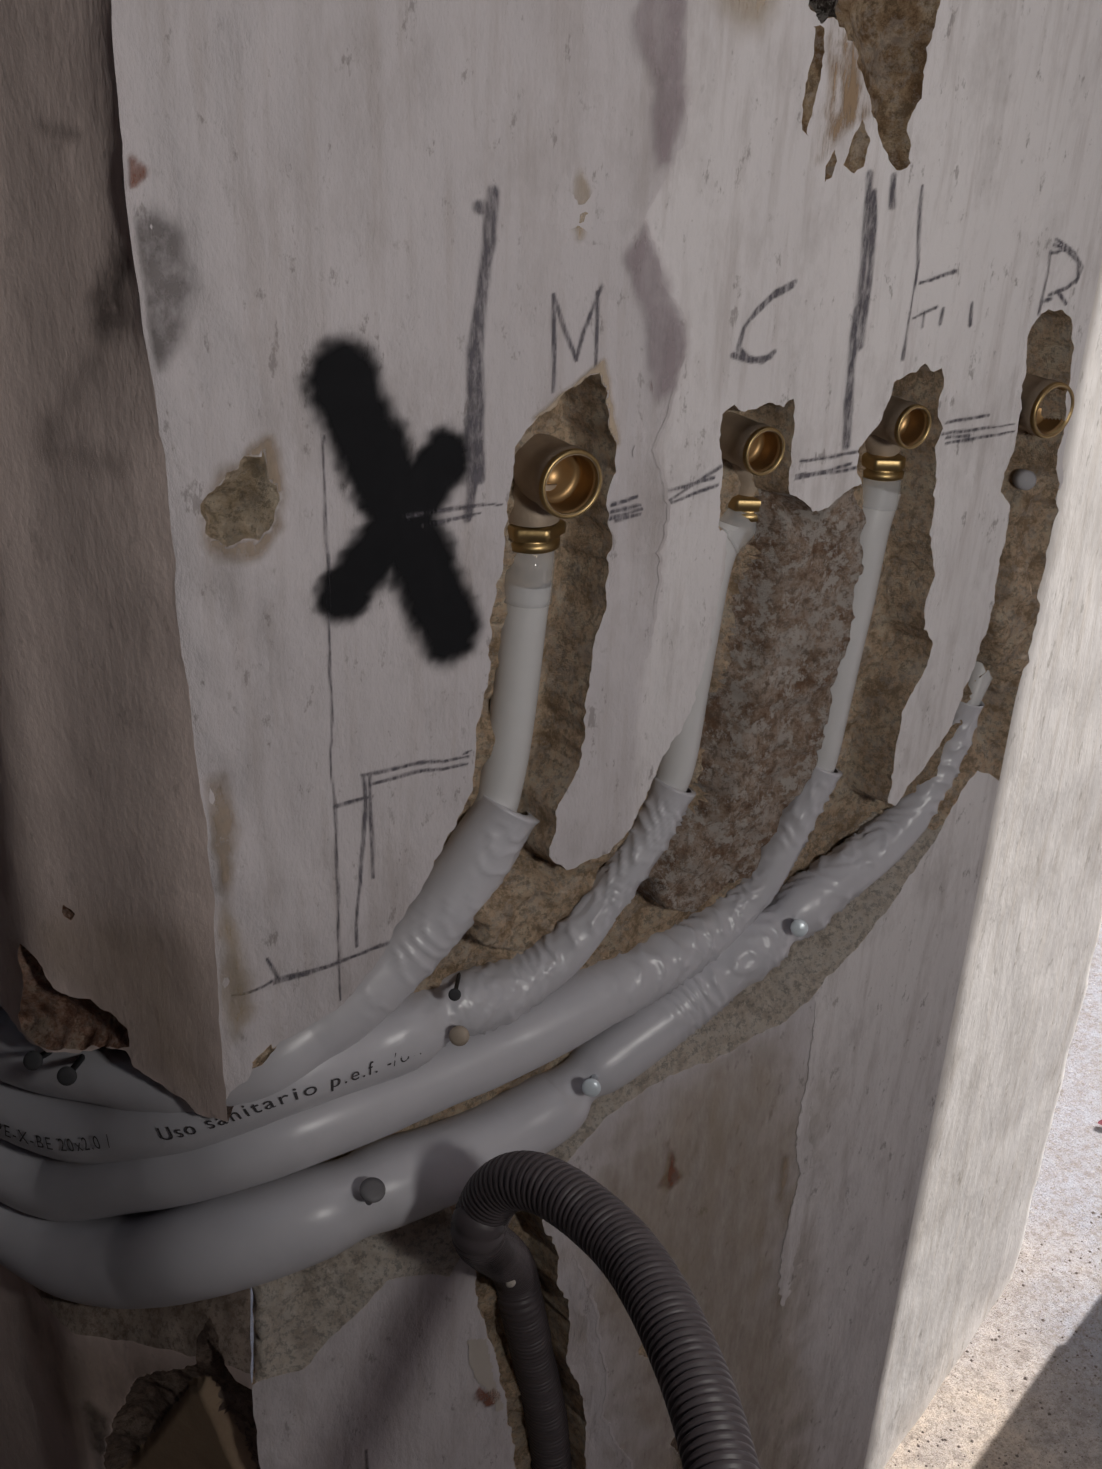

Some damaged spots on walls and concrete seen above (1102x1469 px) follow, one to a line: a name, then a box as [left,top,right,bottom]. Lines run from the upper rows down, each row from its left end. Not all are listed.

flaking render [802,0,941,181]
spalling [200,438,282,557]
flaking render [635,487,866,912]
flaking render [18,944,129,1051]
spalling [546,825,943,1316]
spalling [32,1207,460,1469]